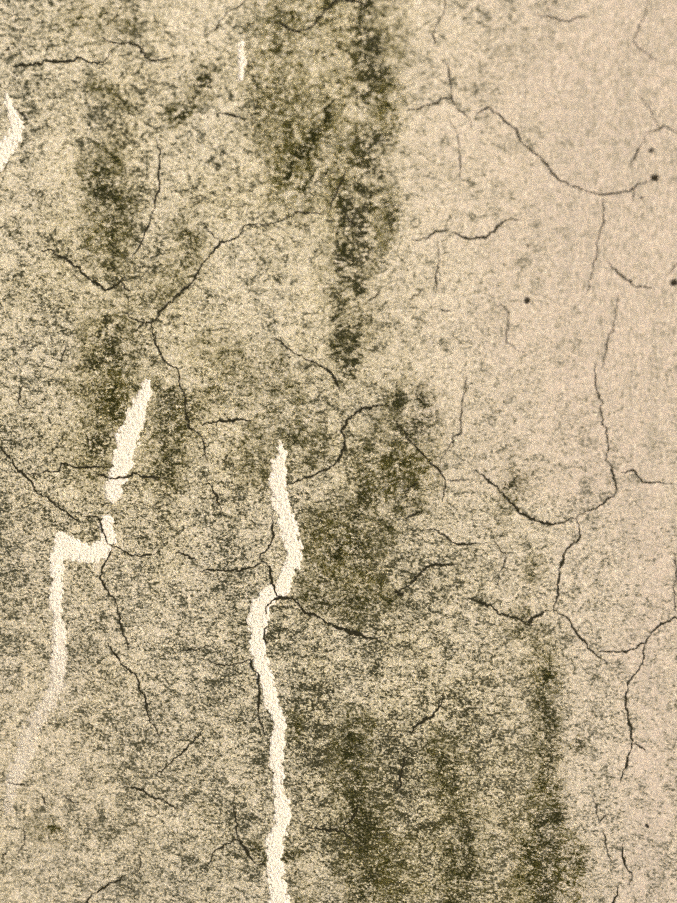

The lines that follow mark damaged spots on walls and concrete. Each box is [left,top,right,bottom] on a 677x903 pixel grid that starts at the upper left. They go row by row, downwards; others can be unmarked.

crack [10,36,169,67]
damp [73,143,139,280]
damp [66,296,225,490]
crack [0,447,383,737]
crack [41,139,366,517]
damp [244,0,409,389]
damp [298,380,449,631]
crack [286,0,677,792]
crack [119,730,203,809]
damp [326,708,424,903]
damp [424,600,591,903]
crack [593,799,633,903]